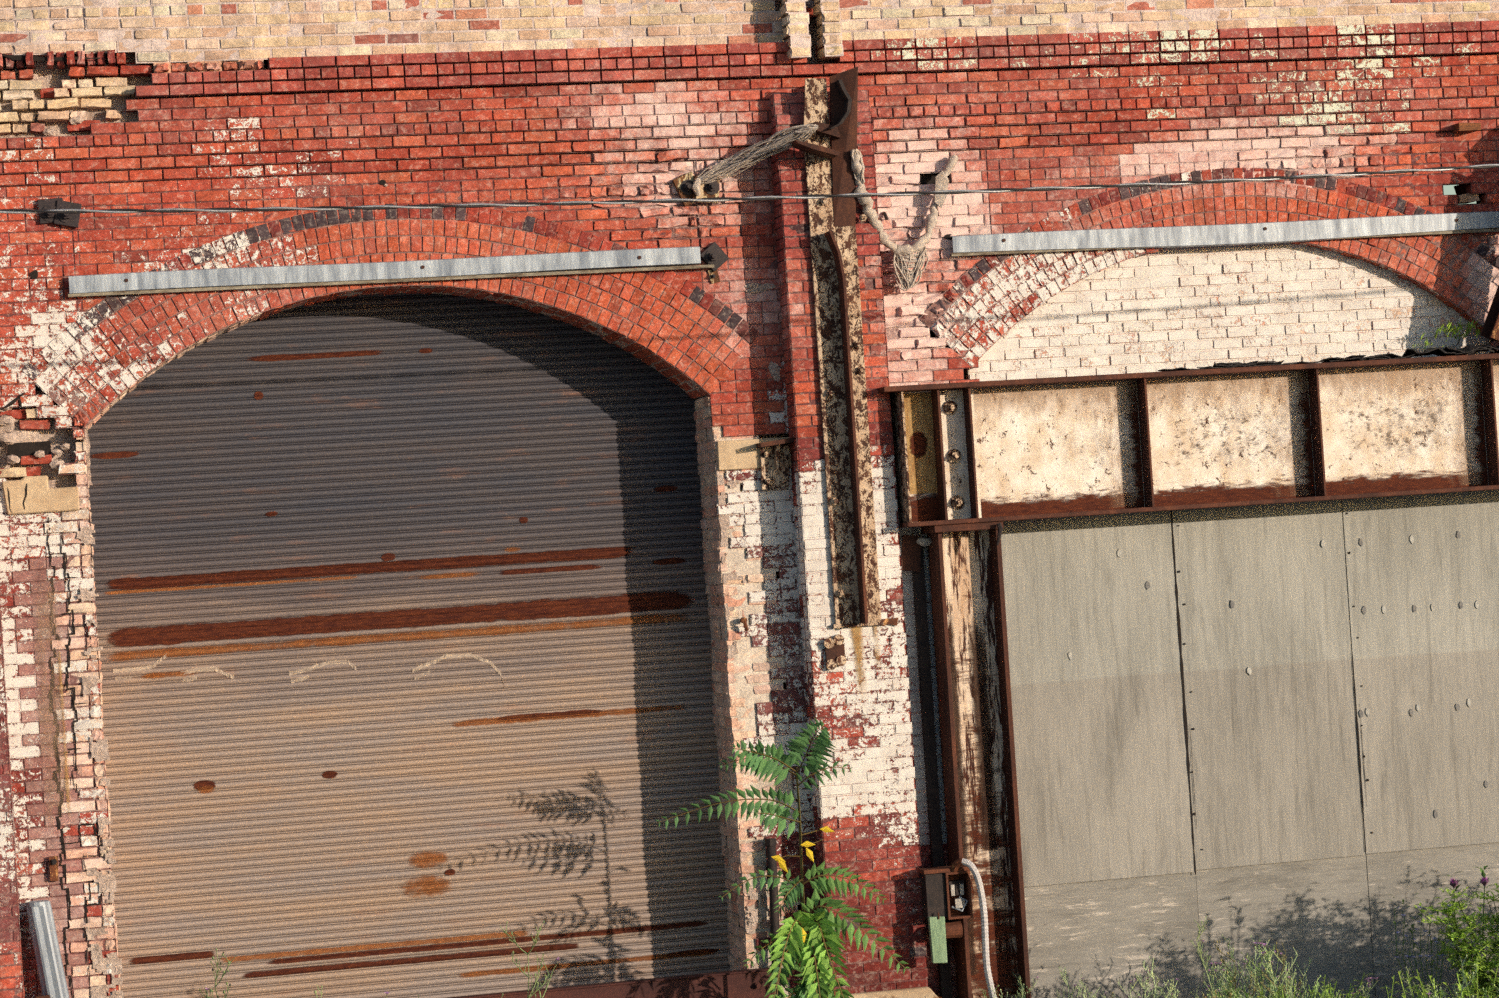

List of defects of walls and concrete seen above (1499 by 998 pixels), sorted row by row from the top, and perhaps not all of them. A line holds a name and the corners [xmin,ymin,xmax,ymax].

spalling [804,0,833,65]
peeling [869,22,1487,136]
peeling [98,118,354,272]
peeling [768,384,789,434]
rust [974,360,1499,518]
peeling [0,49,278,998]
rust [106,547,631,594]
rust [108,591,693,678]
rust [455,705,681,727]
peeling [717,436,947,912]
rust [949,624,1020,998]
rust [130,921,718,978]